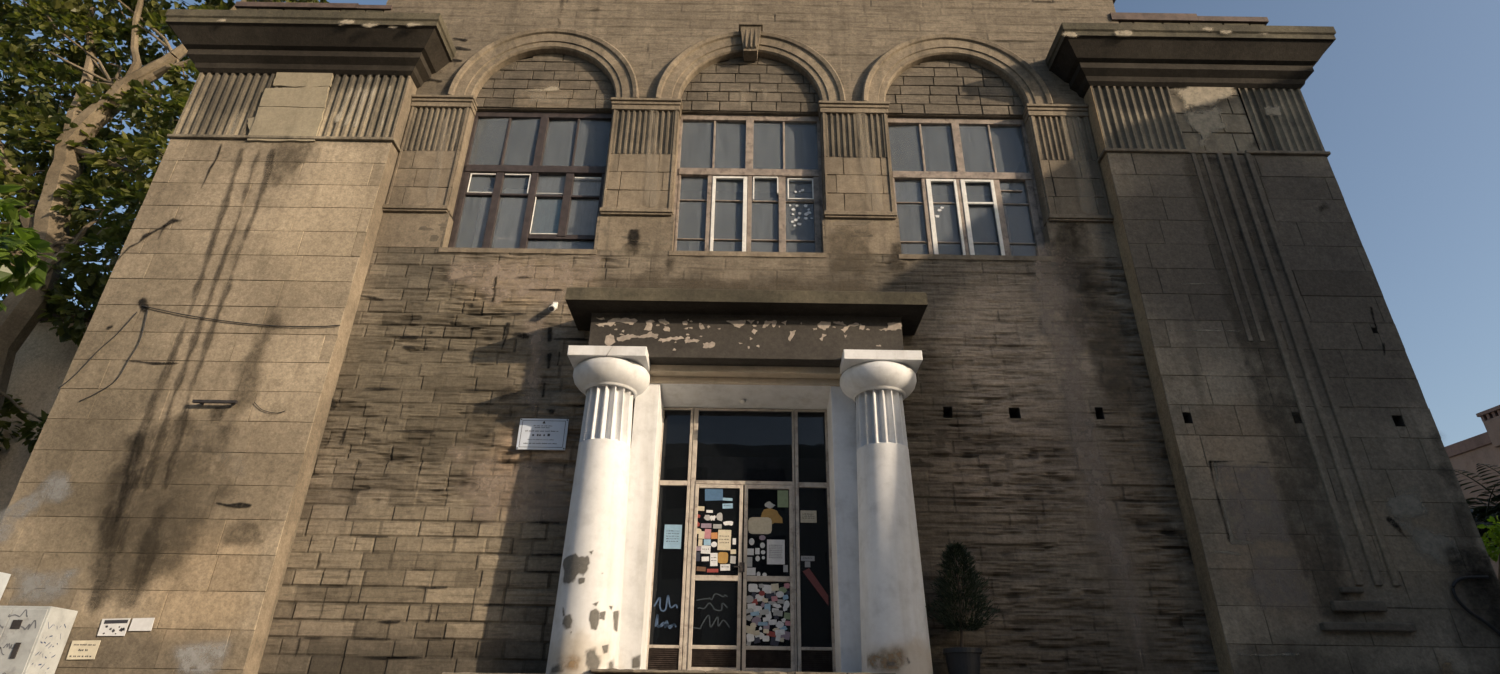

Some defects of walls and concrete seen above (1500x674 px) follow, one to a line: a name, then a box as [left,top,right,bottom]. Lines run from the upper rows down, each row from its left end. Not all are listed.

spalling [1178,87,1233,146]
peeling [596,317,902,351]
damp [91,146,302,608]
damp [1186,153,1349,618]
peeling [563,551,593,584]
peeling [563,602,619,672]